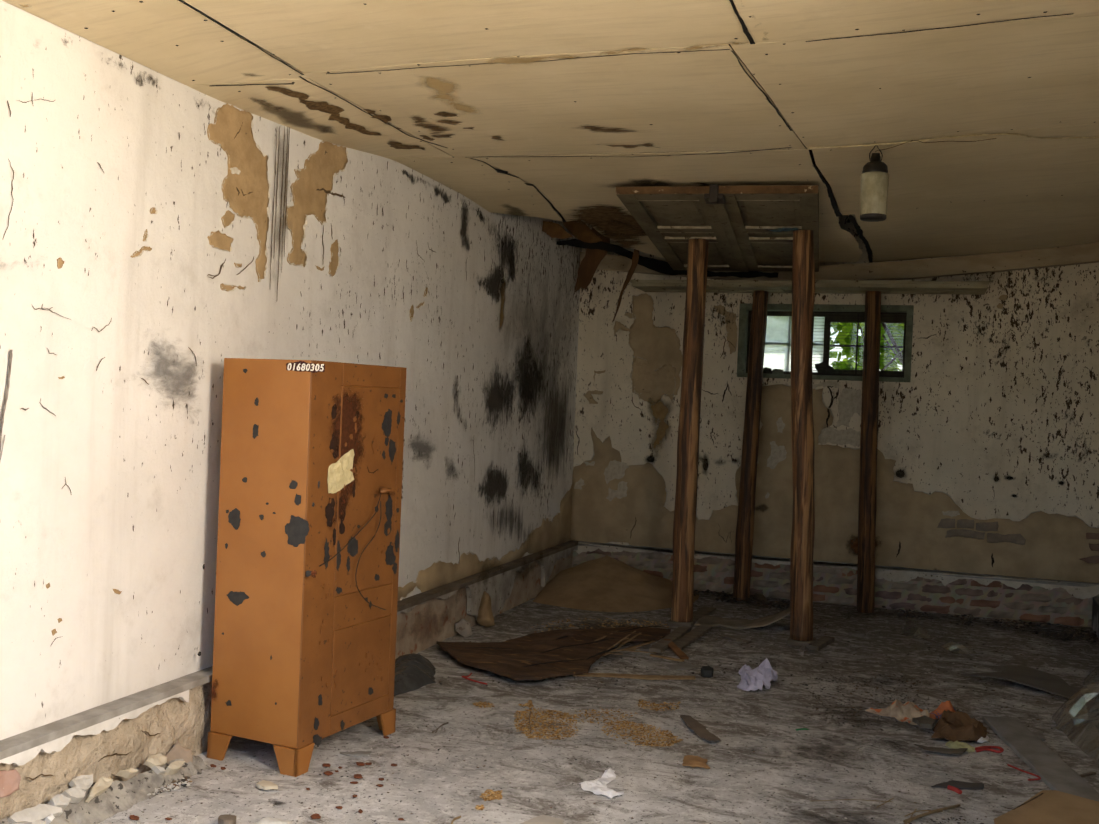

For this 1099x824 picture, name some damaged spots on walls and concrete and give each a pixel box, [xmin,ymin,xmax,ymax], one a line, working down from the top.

flaking render [207,103,271,292]
flaking render [286,141,348,277]
damp [254,78,474,294]
damp [479,323,569,539]
flaking render [395,427,674,659]
flaking render [613,293,683,410]
flaking render [693,466,741,594]
flaking render [750,384,793,599]
flaking render [812,380,862,606]
flaking render [874,449,1099,628]
spalling [0,681,212,820]